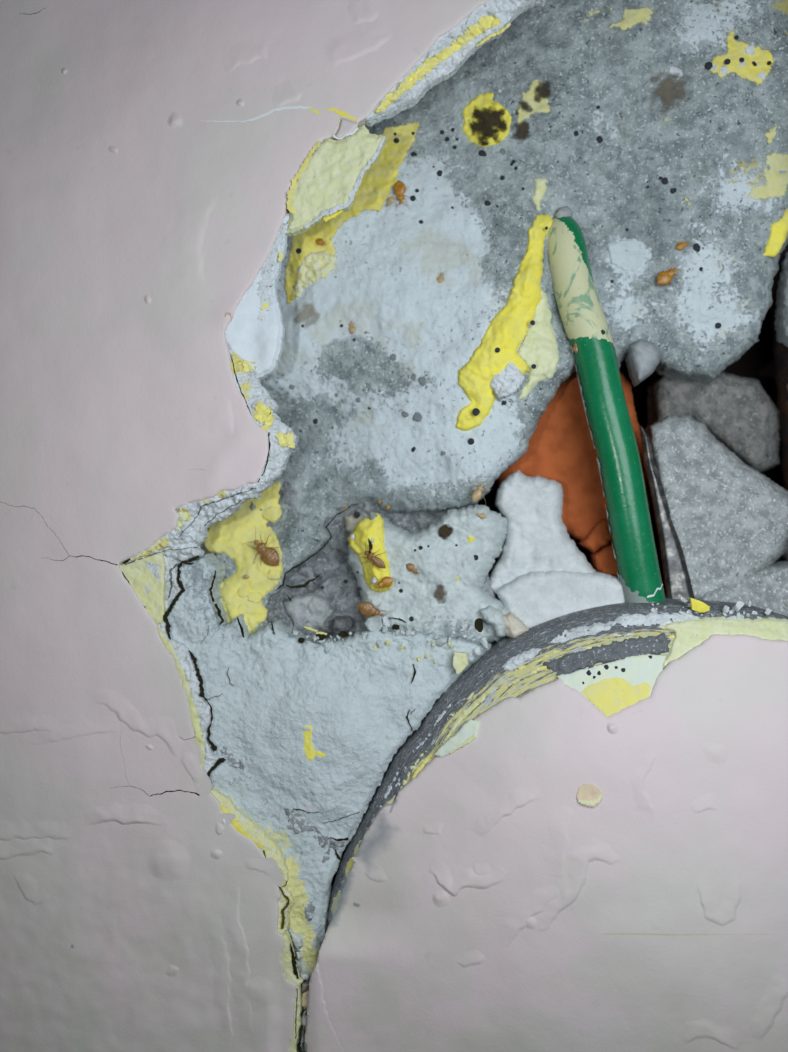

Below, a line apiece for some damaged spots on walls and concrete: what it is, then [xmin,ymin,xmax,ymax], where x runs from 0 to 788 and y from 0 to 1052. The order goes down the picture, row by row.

damp [471,83,550,145]
crack [1,502,118,565]
crack [269,503,360,634]
spalling [120,0,788,980]
crack [113,556,244,796]
peeling [282,931,307,1052]